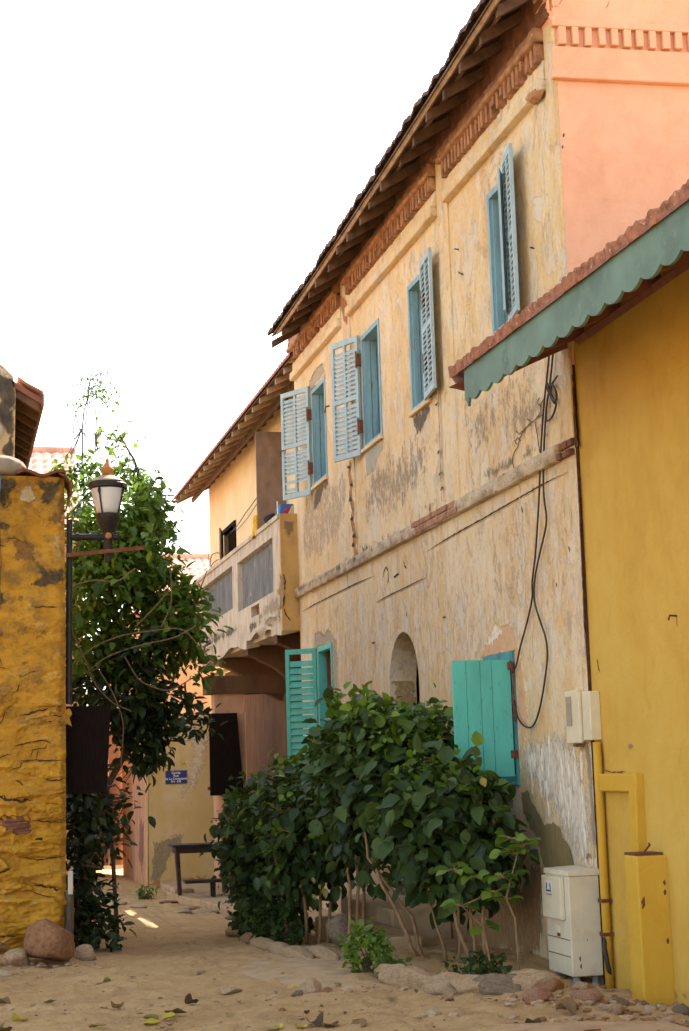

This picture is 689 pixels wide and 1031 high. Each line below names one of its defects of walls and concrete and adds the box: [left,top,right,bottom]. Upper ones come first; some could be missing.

crack [282,370,600,672]
spalling [0,805,40,845]
crack [0,660,63,897]
water stain [451,791,573,953]
peeling [482,622,593,867]